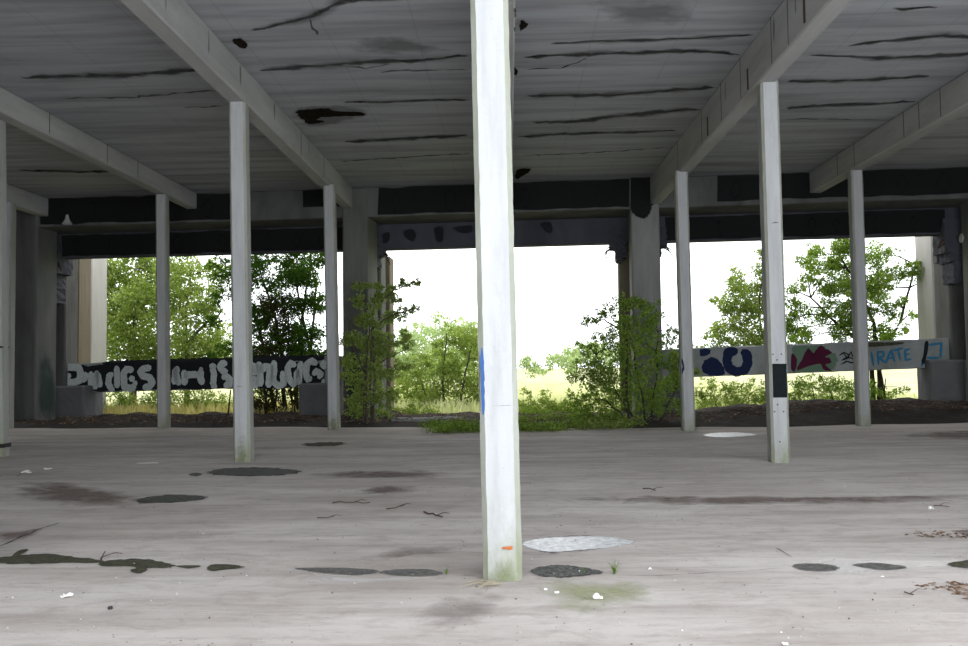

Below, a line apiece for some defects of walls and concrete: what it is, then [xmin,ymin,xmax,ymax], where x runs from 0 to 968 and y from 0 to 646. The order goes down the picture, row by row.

crack [898,4,937,12]
crack [253,0,370,34]
spalling [232,38,248,49]
crack [850,34,968,46]
spalling [296,108,366,125]
leakage [793,563,839,571]
leakage [948,560,968,568]